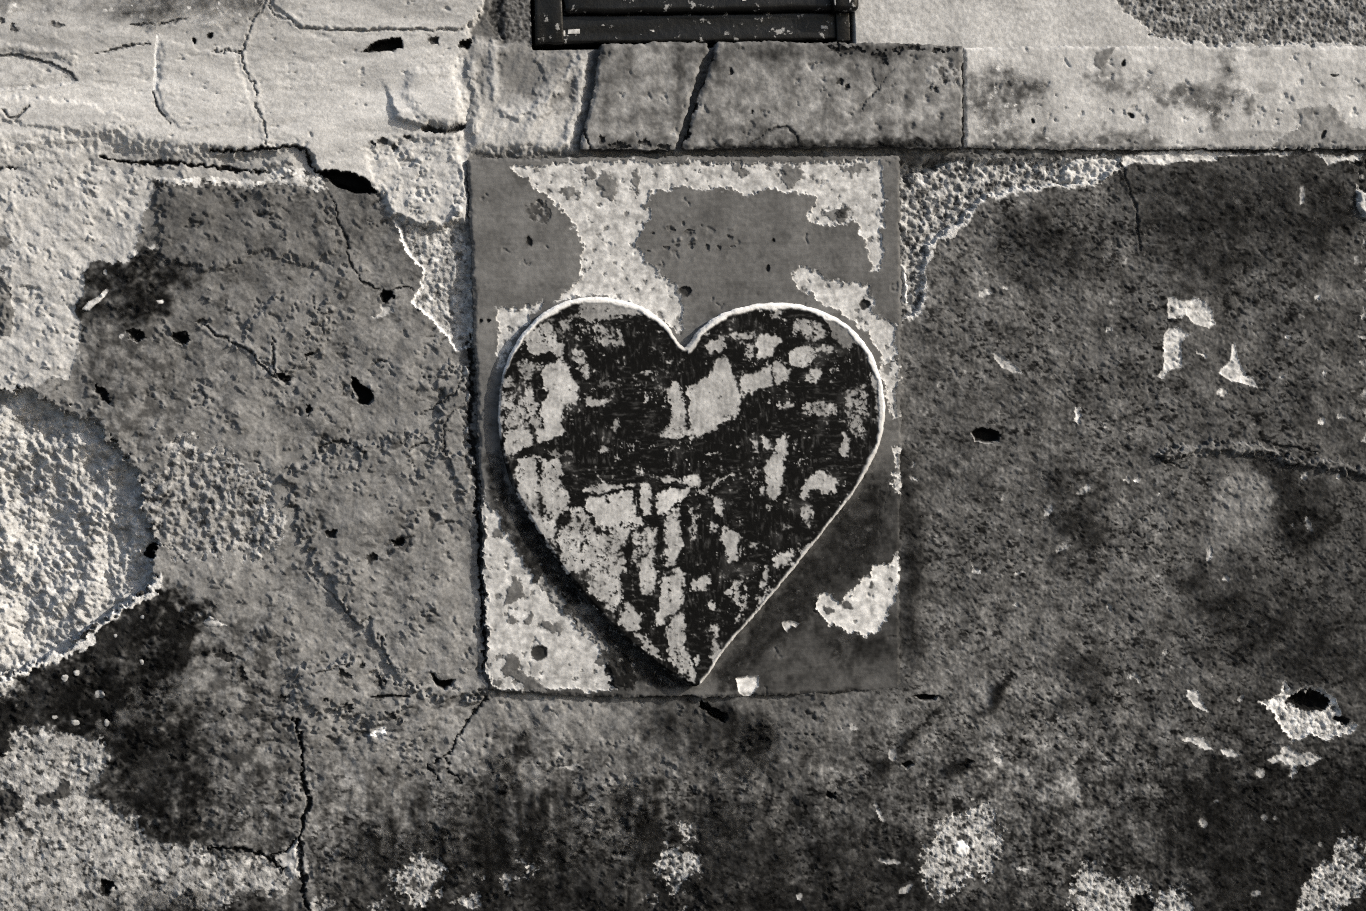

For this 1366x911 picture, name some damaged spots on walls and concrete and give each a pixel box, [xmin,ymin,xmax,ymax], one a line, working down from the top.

crack [0,52,78,81]
crack [100,0,463,290]
flaking render [1116,0,1366,48]
peeling [393,104,1291,419]
flaking render [0,161,326,697]
peeling [481,495,615,694]
water stain [485,455,884,771]
water stain [0,578,222,852]
crack [208,718,313,911]
crack [426,689,492,784]
water stain [357,724,924,911]
water stain [1161,755,1366,911]